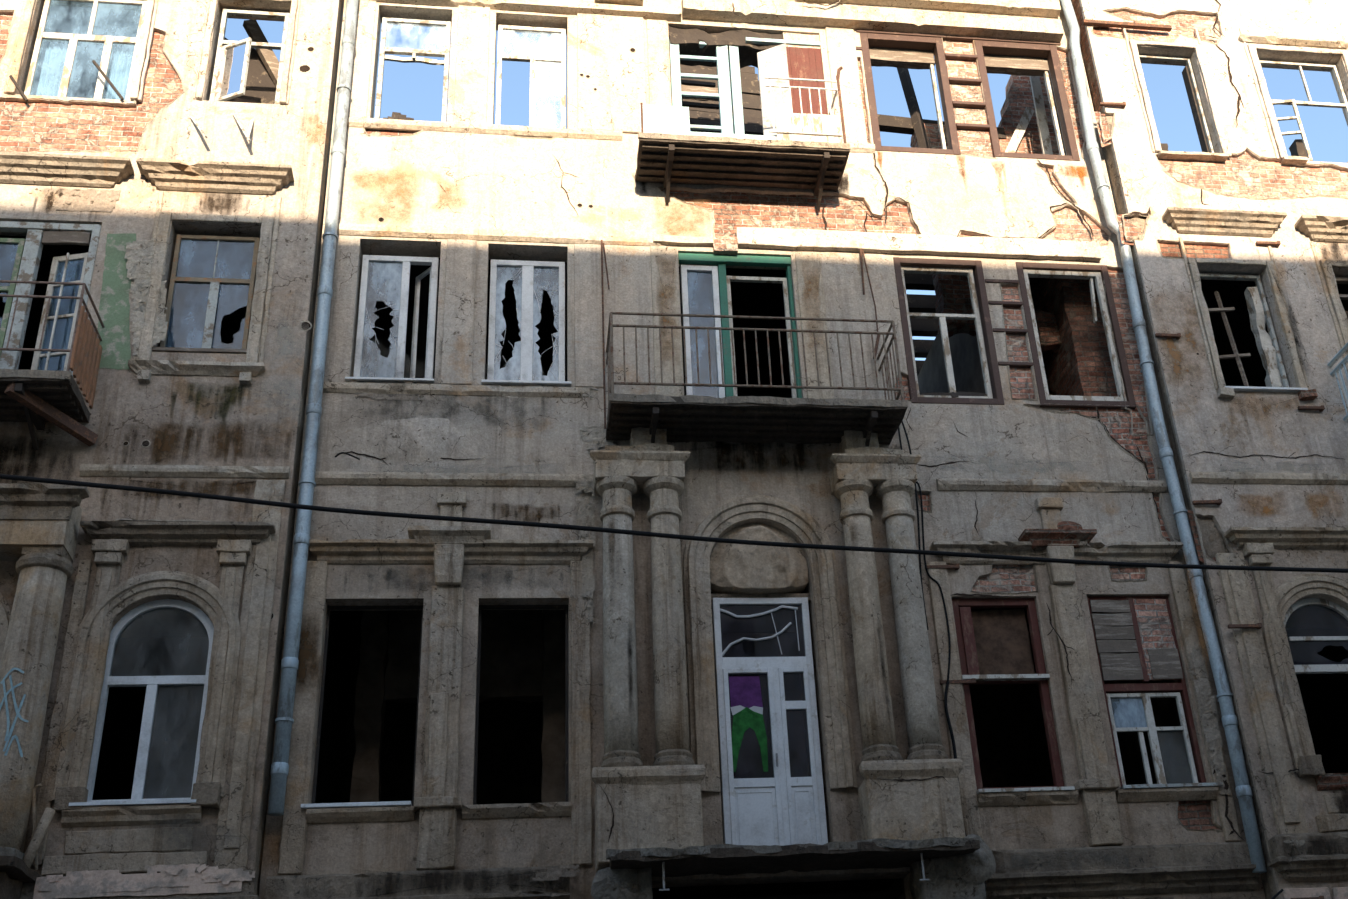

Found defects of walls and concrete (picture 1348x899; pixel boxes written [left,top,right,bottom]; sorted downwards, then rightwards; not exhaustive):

flaking render [0,26,185,153]
crack [1207,0,1244,127]
crack [553,155,580,215]
flaking render [657,186,922,237]
crack [822,153,921,234]
flaking render [958,163,1232,259]
flaking render [1155,147,1348,200]
water stain [151,386,273,462]
crack [335,451,389,466]
flaking render [999,266,1174,542]
crack [1192,451,1343,461]
flaking render [970,564,1039,595]